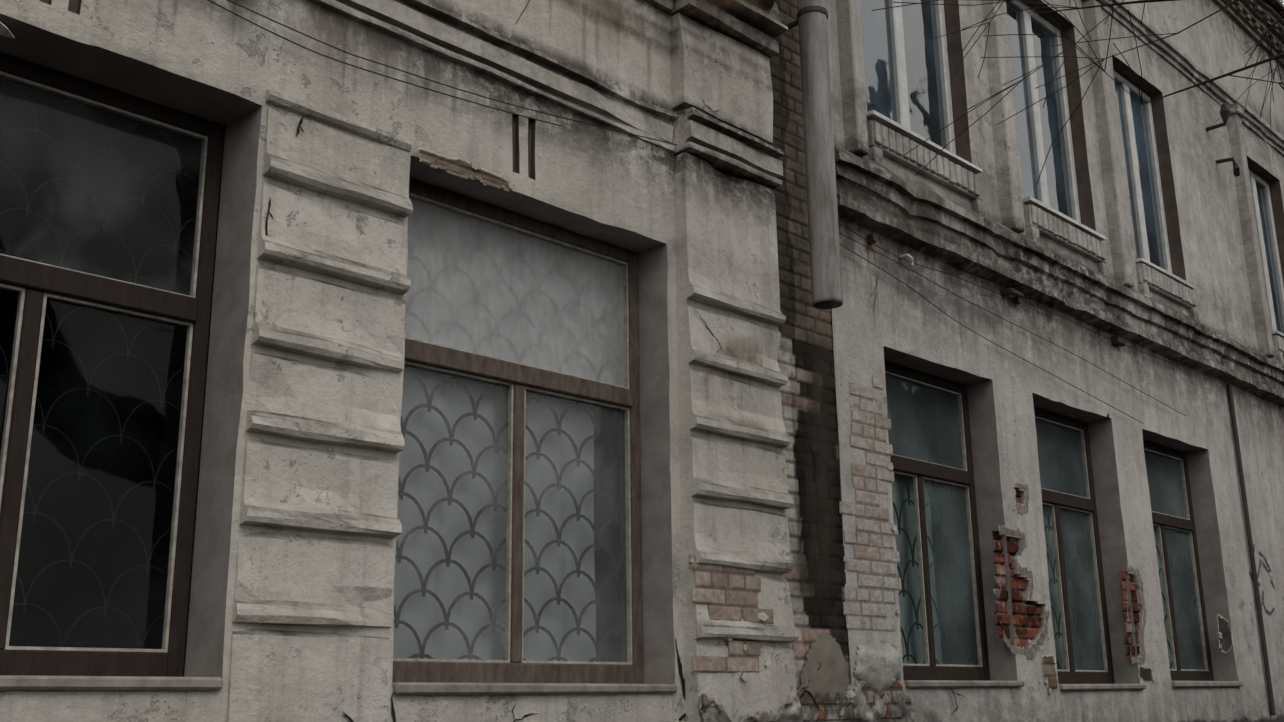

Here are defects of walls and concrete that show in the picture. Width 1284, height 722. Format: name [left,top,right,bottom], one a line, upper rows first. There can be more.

spalling [839,375,901,631]
spalling [688,554,774,637]
spalling [692,637,771,681]
spalling [699,661,927,722]
spalling [992,530,1058,694]
spalling [1120,570,1156,683]